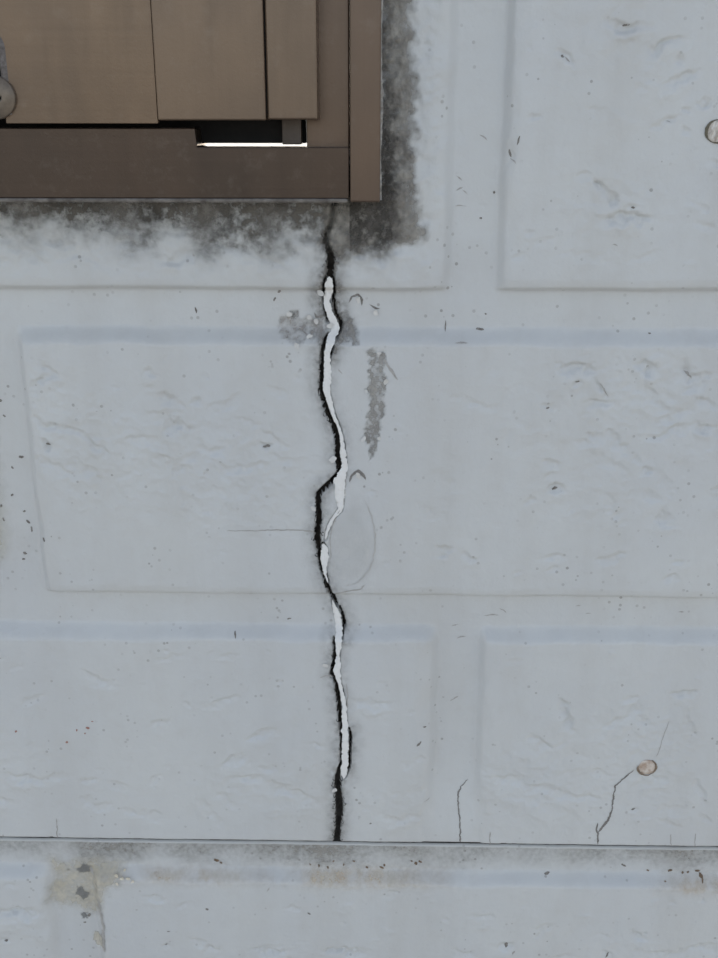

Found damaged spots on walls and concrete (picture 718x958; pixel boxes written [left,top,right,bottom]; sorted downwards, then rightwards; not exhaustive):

leakage [0,196,351,242]
crack [228,203,364,840]